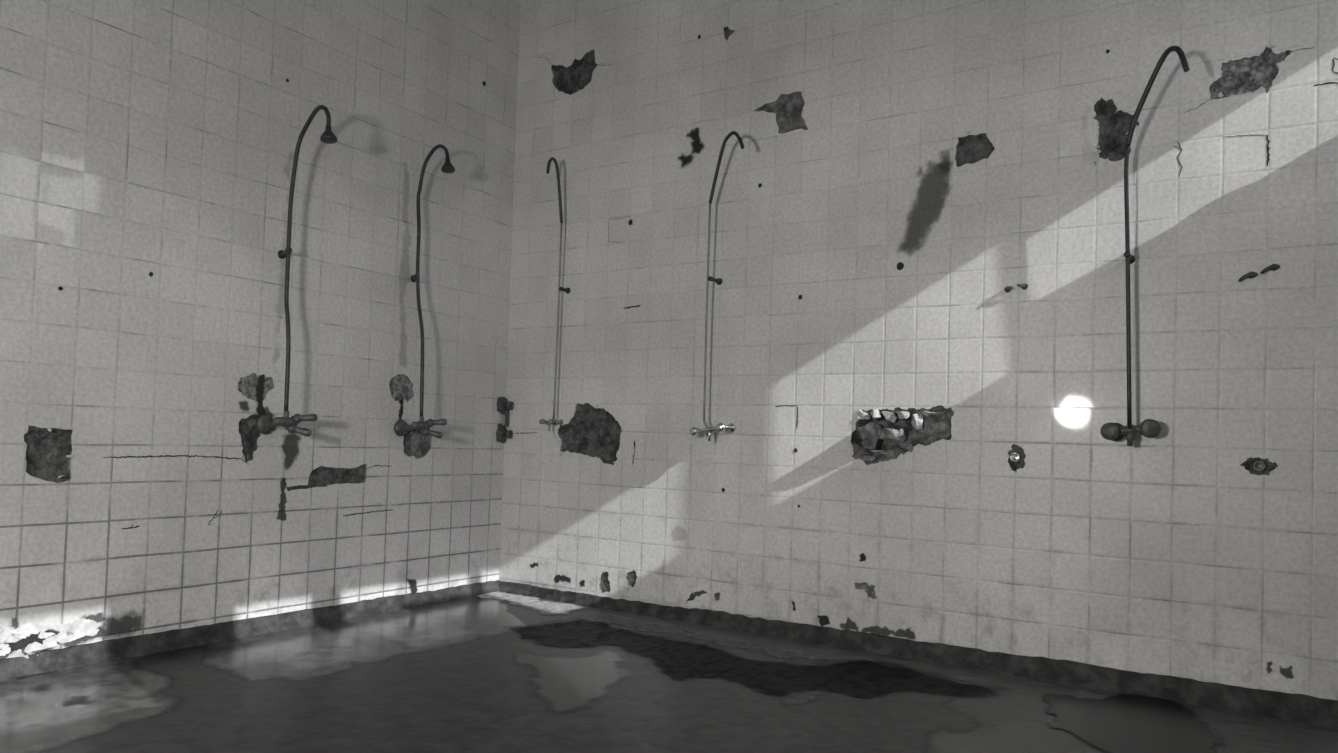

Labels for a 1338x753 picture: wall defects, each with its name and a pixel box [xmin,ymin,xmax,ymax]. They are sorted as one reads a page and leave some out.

spalling [551,50,598,95]
spalling [1209,41,1293,99]
peeling [754,91,808,134]
peeling [955,130,995,167]
spalling [1093,97,1139,162]
leakage [901,155,949,253]
peeling [24,425,73,483]
spalling [238,373,274,462]
spalling [286,464,367,491]
peeling [403,429,432,459]
spalling [558,403,622,465]
spalling [850,405,954,465]